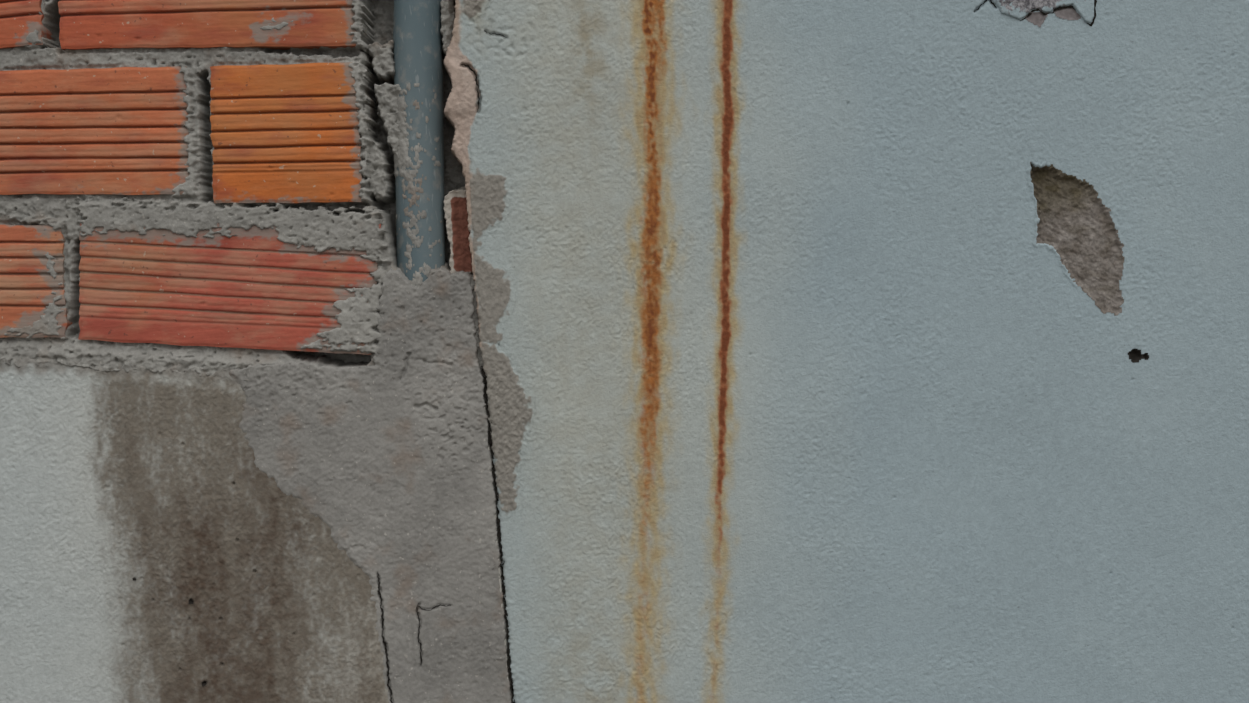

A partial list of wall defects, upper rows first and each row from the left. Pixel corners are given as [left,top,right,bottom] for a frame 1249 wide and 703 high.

peeling [995,0,1097,27]
spalling [1026,159,1124,316]
rust [595,0,756,703]
spalling [1128,349,1149,363]
water stain [72,361,389,703]
crack [481,366,515,703]
crack [377,572,393,703]
crack [417,603,447,663]